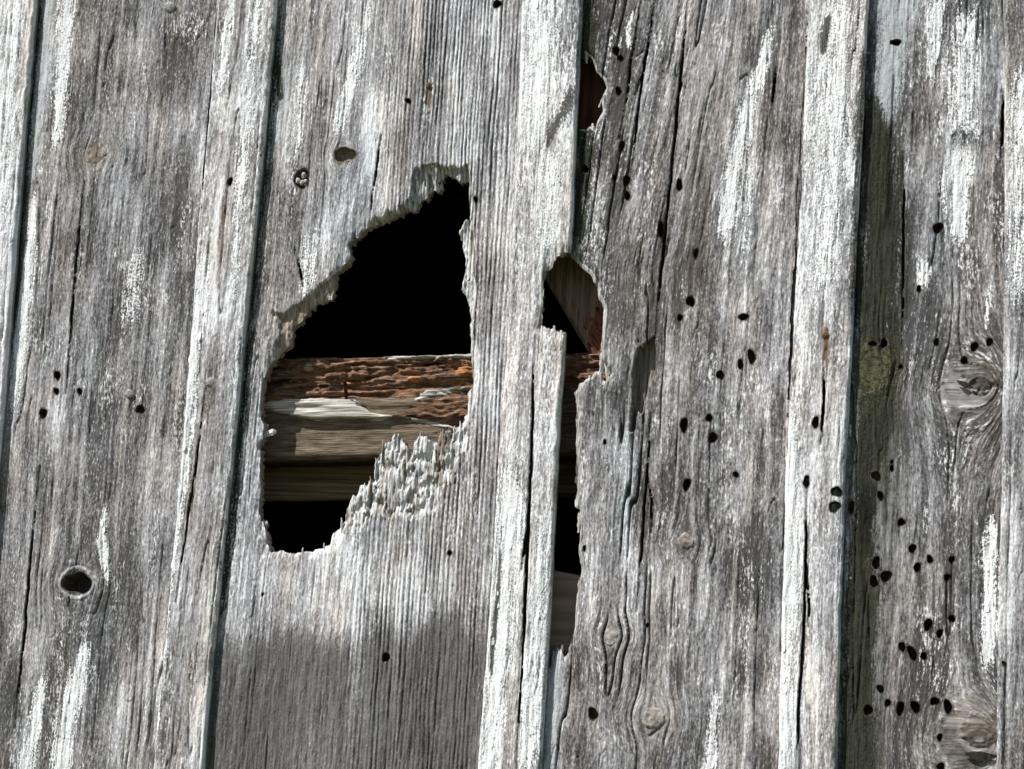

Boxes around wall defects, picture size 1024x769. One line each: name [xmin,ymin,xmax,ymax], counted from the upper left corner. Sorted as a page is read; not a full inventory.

spalling [273,224,337,359]
spalling [338,221,479,535]
spalling [364,165,471,232]
peeling [478,0,614,769]
crack [787,98,804,417]
rust [822,326,830,386]
crack [516,338,535,763]
crack [795,490,811,761]